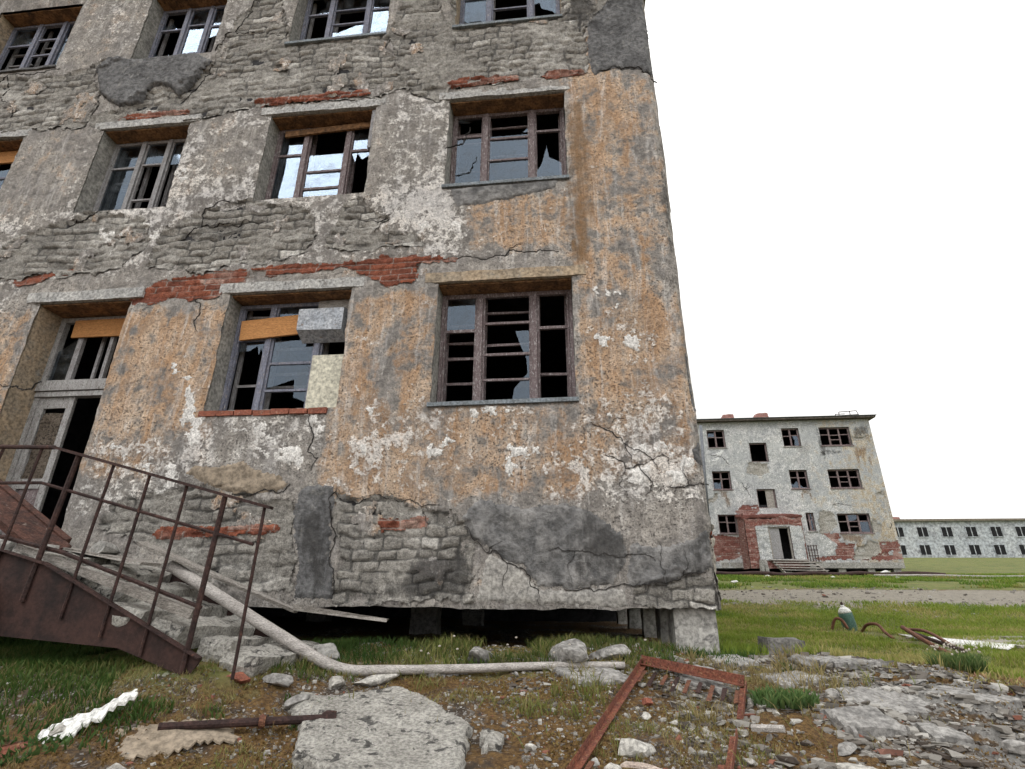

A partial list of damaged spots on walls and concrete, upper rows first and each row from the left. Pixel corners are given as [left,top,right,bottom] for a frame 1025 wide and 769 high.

flaking render [0,0,607,132]
flaking render [0,197,467,305]
crack [458,244,559,260]
peeling [623,334,641,351]
crack [307,415,318,468]
crack [591,417,709,500]
crack [328,489,440,599]
flaking render [331,492,477,607]
crack [464,526,540,604]
crack [554,542,706,592]
flaking render [633,524,742,611]
flaking render [814,510,903,561]